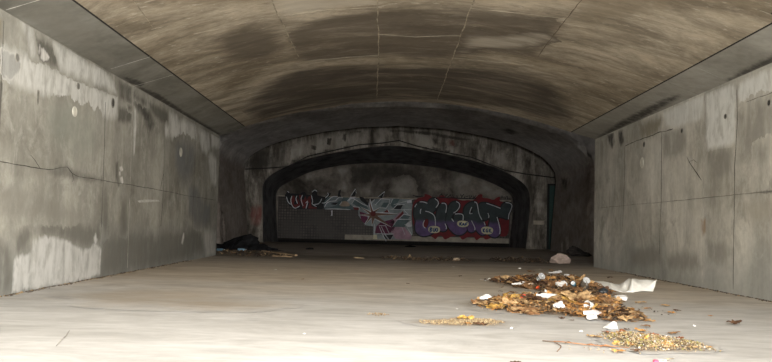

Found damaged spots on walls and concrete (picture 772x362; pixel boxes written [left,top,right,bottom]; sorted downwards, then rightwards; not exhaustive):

crack [0,157,213,225]
leakage [0,0,220,296]